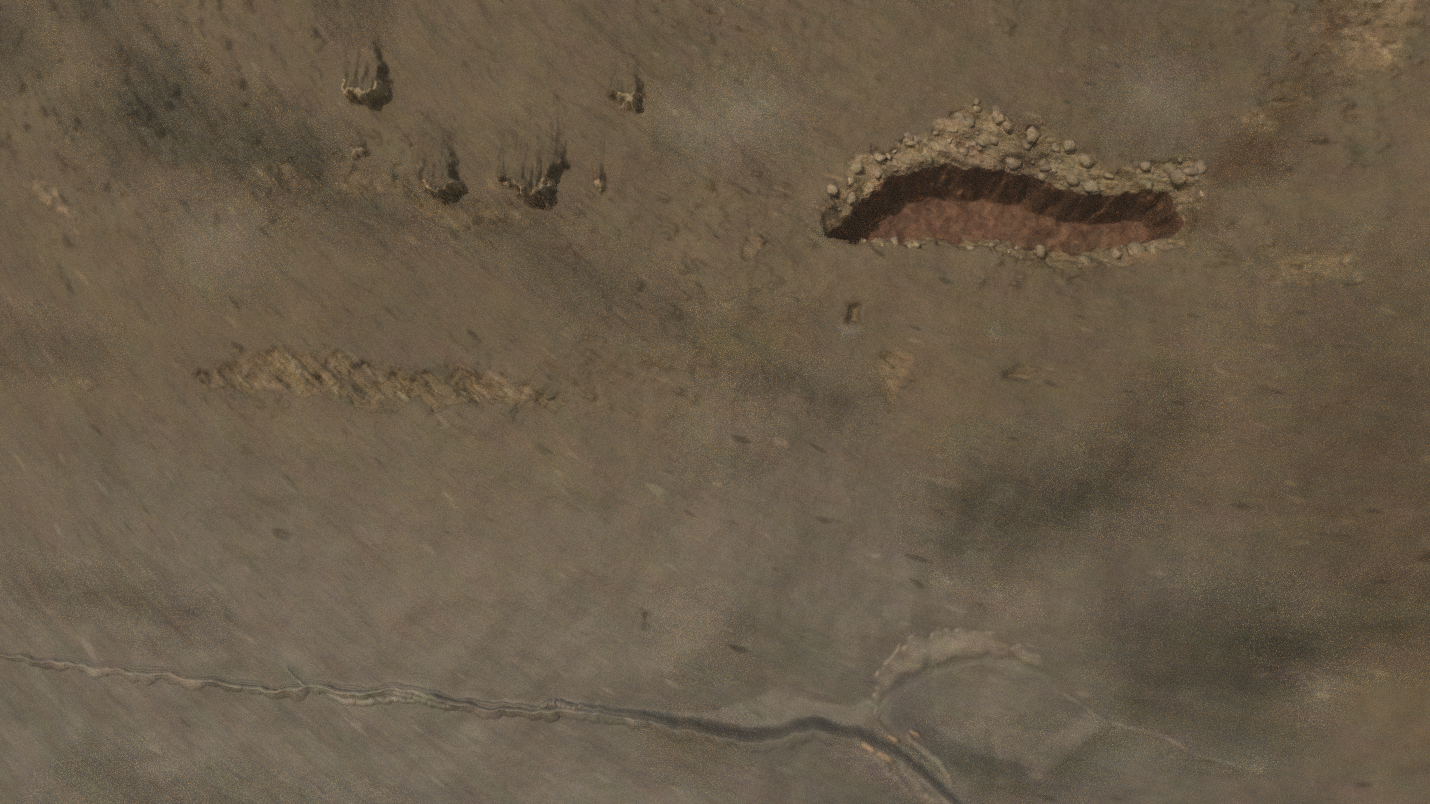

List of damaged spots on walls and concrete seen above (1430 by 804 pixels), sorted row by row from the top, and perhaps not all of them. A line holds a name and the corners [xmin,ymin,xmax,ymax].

peeling [341,0,393,160]
peeling [408,106,466,204]
peeling [495,92,570,209]
peeling [605,38,645,112]
spalling [815,98,1214,281]
crack [0,651,959,804]